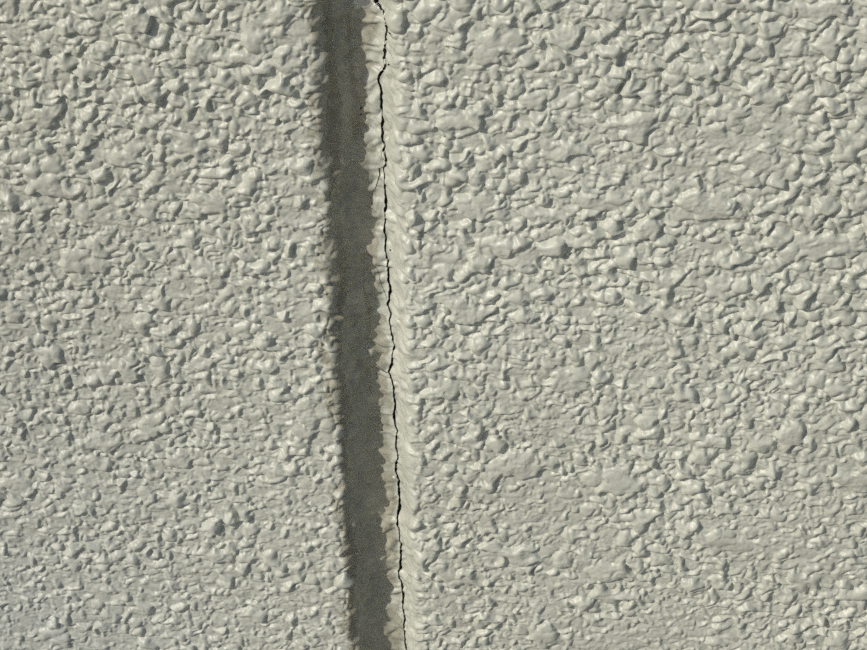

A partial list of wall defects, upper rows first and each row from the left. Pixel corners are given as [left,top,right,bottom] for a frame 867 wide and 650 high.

crack [372,0,407,650]